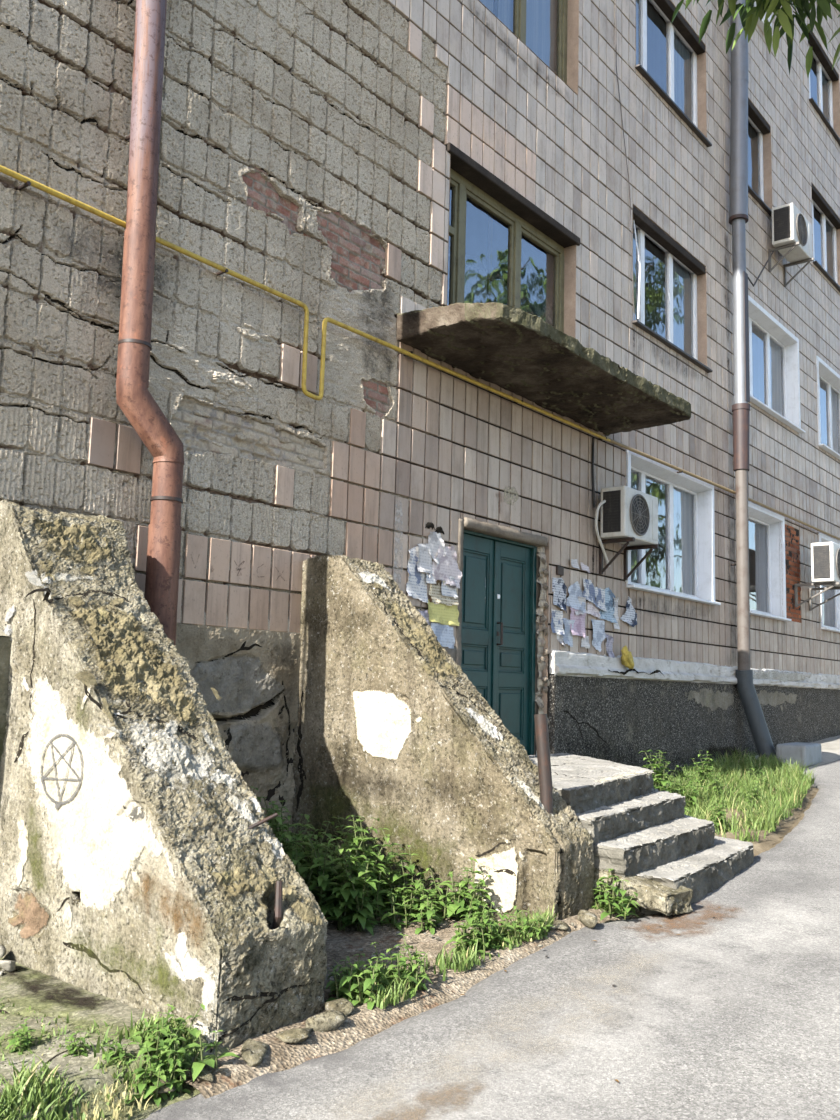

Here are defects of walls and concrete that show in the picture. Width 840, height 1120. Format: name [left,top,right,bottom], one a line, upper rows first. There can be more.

spalling [242,165,387,292]
crack [0,229,119,372]
crack [0,404,89,424]
crack [150,334,312,433]
spalling [165,359,330,475]
spalling [780,524,802,623]
crack [14,588,137,763]
flaking render [352,690,422,759]
flaking render [22,655,285,930]
flaking render [8,818,49,939]
crack [63,942,144,994]
water stain [378,1086,480,1120]